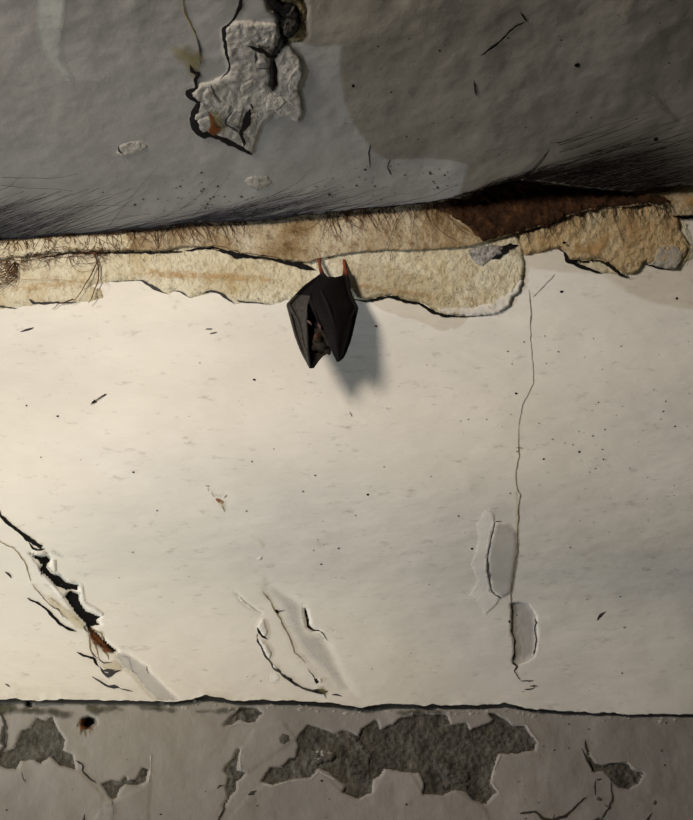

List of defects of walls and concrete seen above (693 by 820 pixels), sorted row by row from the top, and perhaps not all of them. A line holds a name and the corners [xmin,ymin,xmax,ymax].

crack [181,0,253,155]
flaking render [192,0,307,153]
crack [247,0,301,91]
corrosion [209,112,221,136]
spalling [468,243,518,267]
crack [486,248,630,680]
corrosion [32,584,112,660]
crack [0,512,149,691]
crack [257,591,341,697]
spalling [0,717,75,769]
spalling [248,713,539,804]
spalling [582,740,645,809]